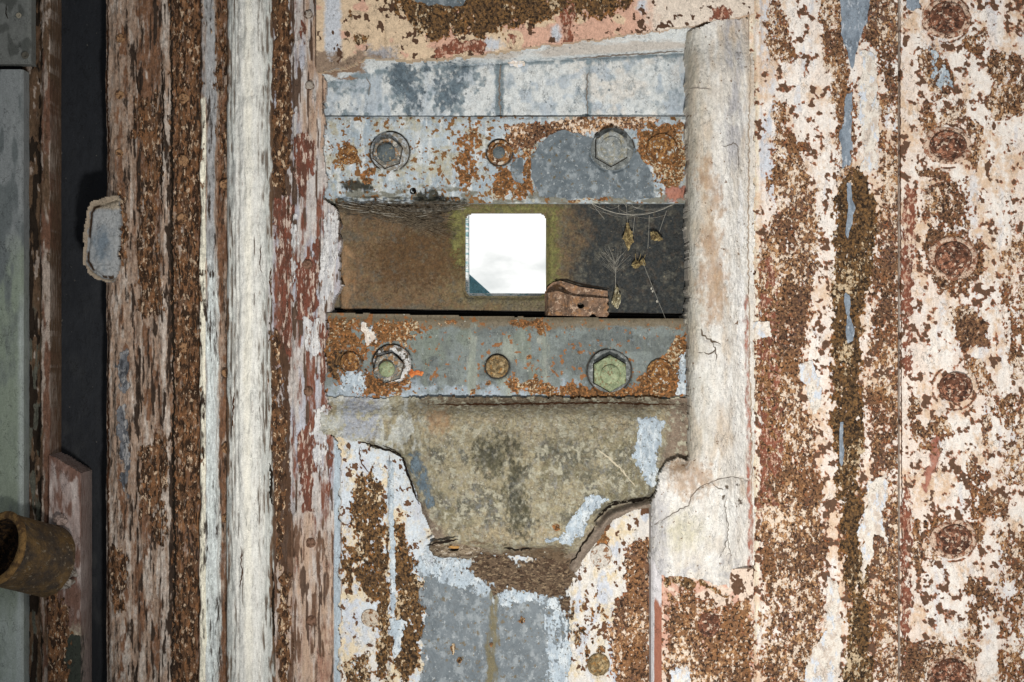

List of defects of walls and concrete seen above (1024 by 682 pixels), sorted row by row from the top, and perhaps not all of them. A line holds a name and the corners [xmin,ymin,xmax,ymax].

corrosion [453,117,687,202]
peeling [857,50,882,173]
peeling [267,0,368,682]
corrosion [324,316,456,399]
corrosion [504,331,687,399]
crack [569,51,753,566]
corrosion [662,0,1024,682]
crack [427,538,458,546]
crack [506,545,532,553]
peeling [857,474,893,581]
peeling [388,617,407,662]
peeling [804,576,844,682]